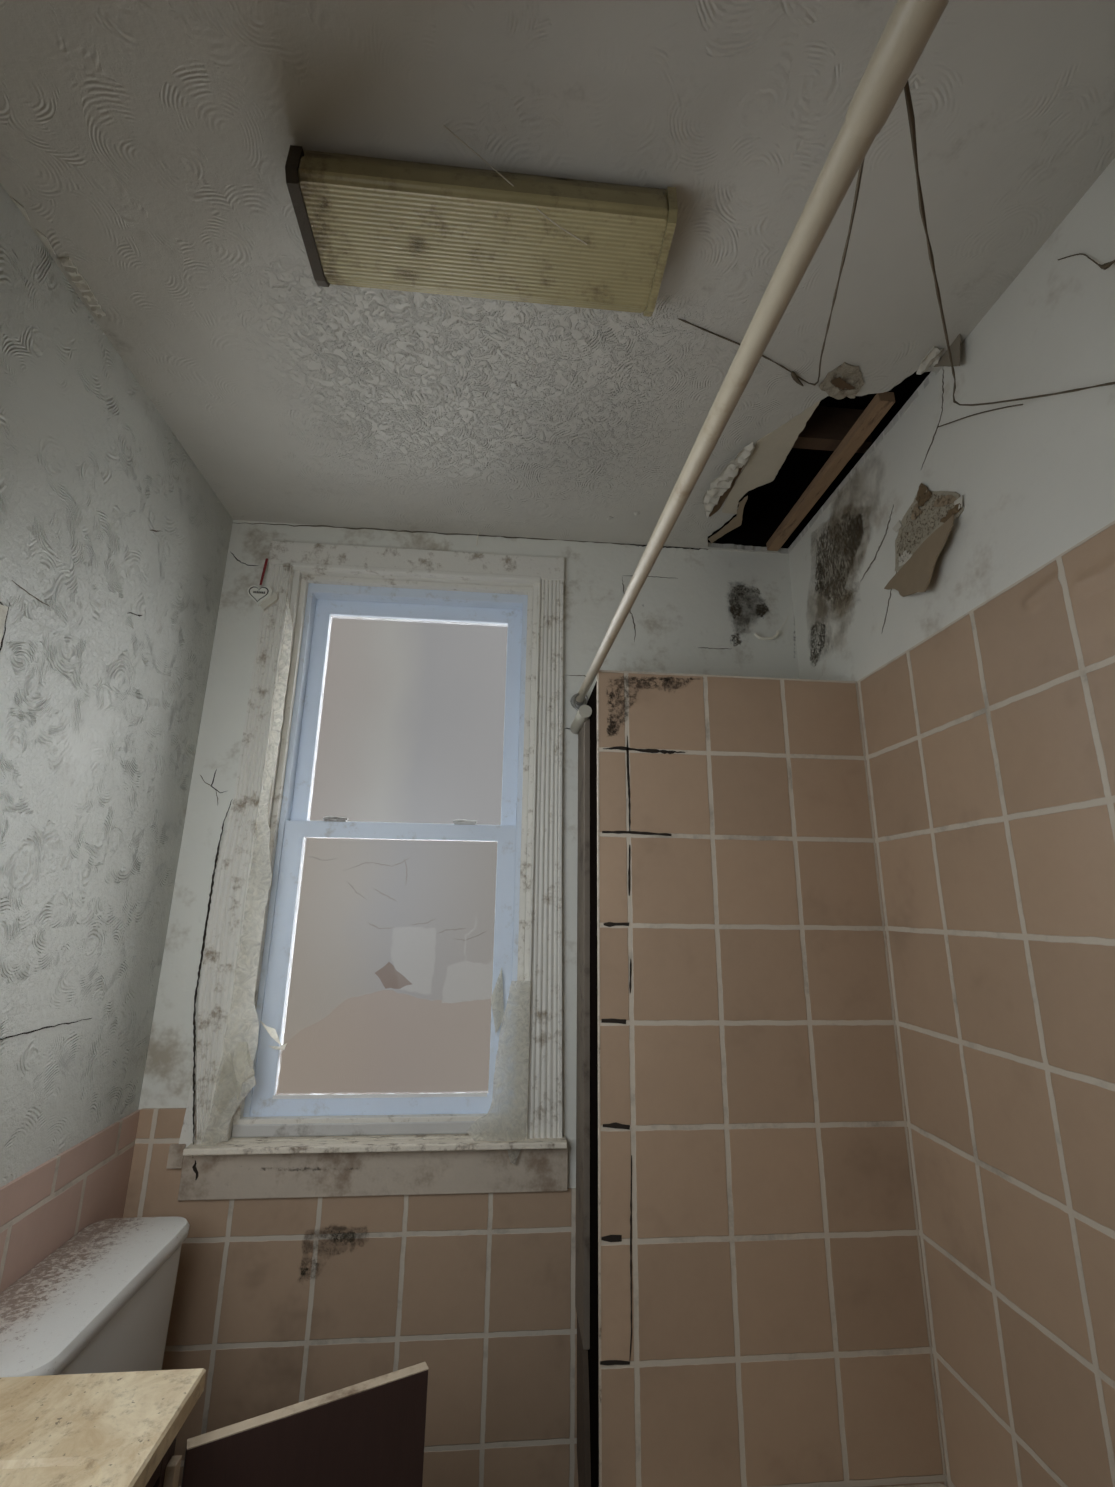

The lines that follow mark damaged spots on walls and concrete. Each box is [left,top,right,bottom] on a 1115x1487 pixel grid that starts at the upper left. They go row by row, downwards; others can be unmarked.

spalling [819,362,864,400]
spalling [860,346,964,634]
water stain [815,475,864,606]
mould [730,585,769,646]
water stain [794,619,826,666]
crack [192,769,232,1180]
crack [0,1018,91,1040]